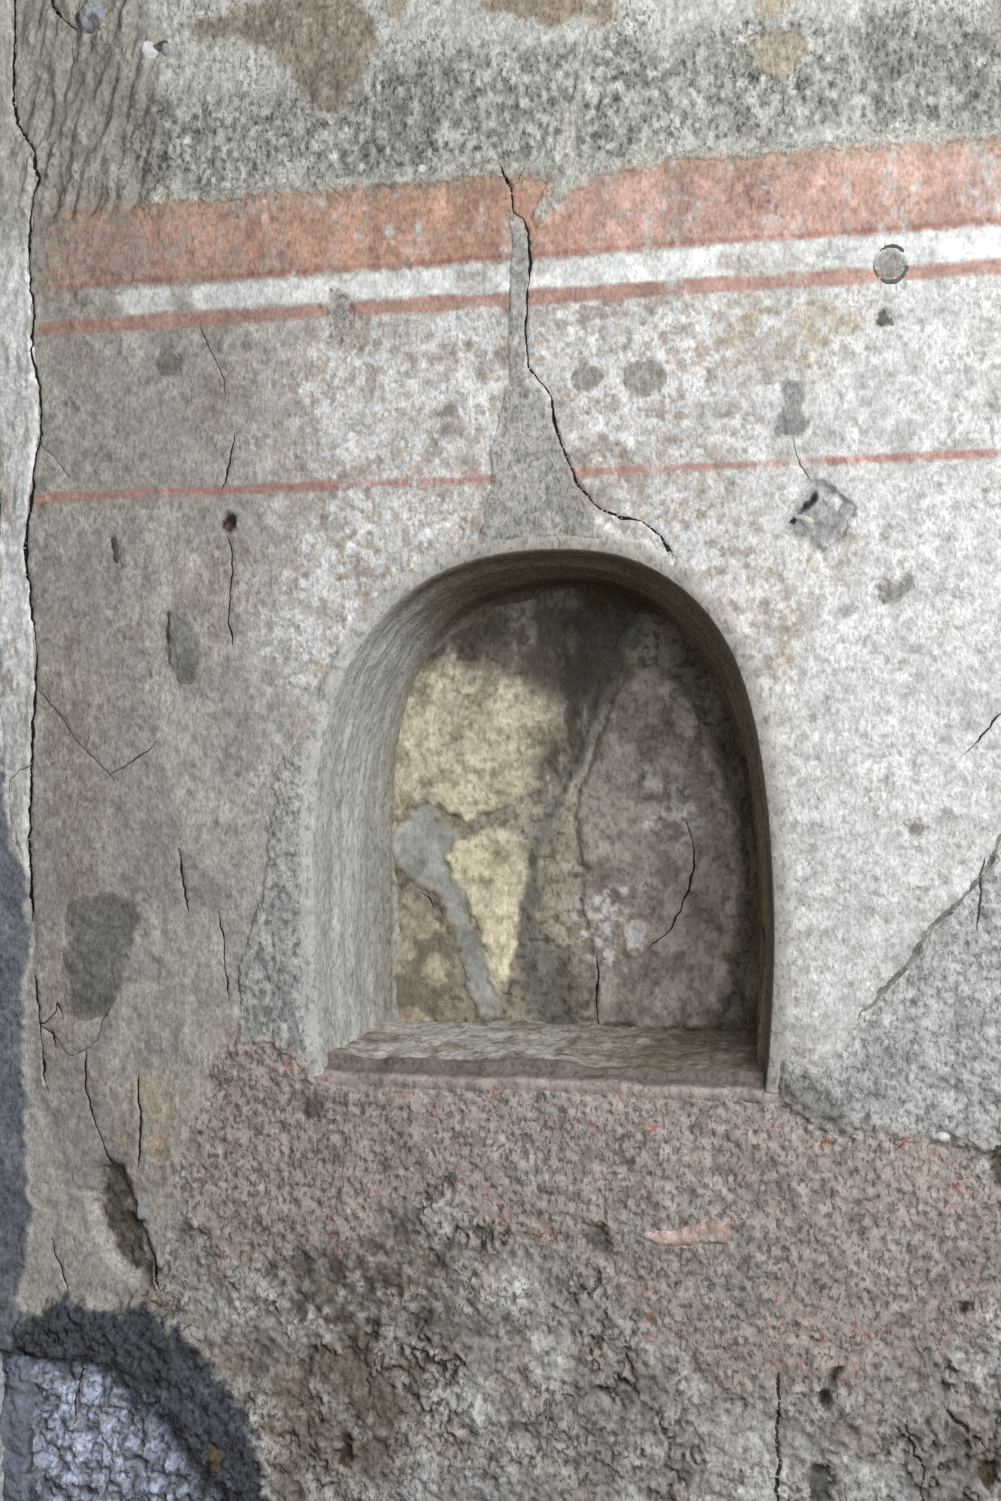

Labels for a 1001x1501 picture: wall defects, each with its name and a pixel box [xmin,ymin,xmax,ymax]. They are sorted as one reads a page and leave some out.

damp [115,0,1001,220]
crack [0,0,159,921]
crack [499,162,673,559]
spalling [783,481,854,552]
damp [131,484,249,873]
crack [962,713,1001,756]
damp [83,894,241,1176]
crack [858,834,1001,1020]